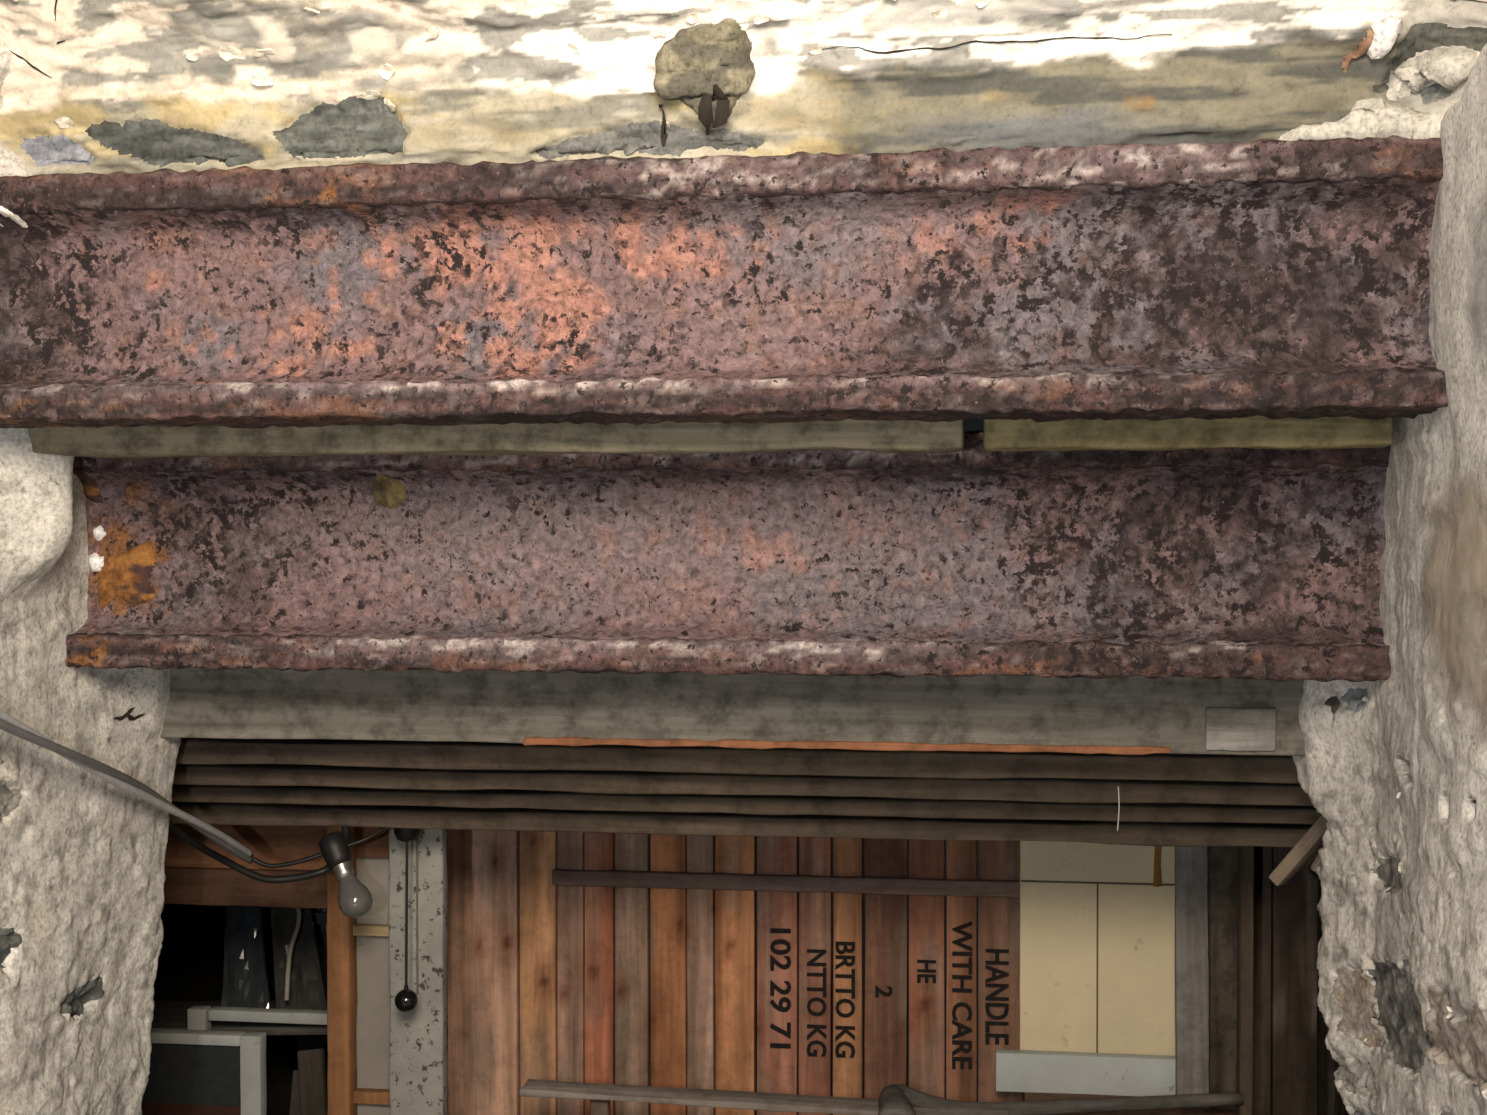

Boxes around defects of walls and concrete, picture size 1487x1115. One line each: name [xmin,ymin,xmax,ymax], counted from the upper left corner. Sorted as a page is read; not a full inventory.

peeling [651,11,699,38]
peeling [753,12,783,54]
peeling [862,0,1082,31]
spalling [1341,15,1487,94]
peeling [20,0,439,168]
spalling [1418,82,1452,105]
spalling [535,119,765,160]
corrosion [73,472,101,503]
corrosion [372,473,408,509]
corrosion [97,541,157,610]
spalling [0,780,21,822]
spalling [0,928,22,969]